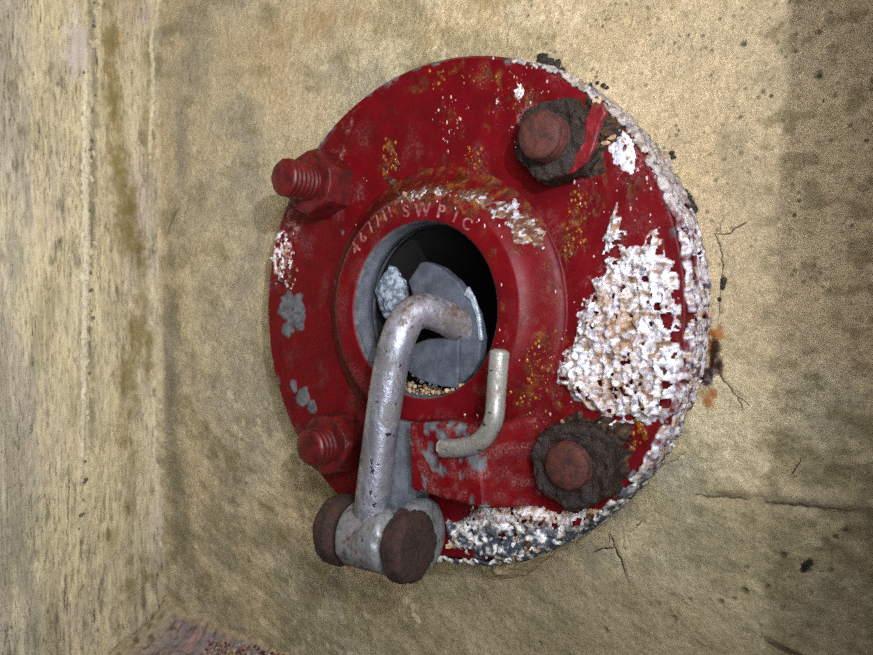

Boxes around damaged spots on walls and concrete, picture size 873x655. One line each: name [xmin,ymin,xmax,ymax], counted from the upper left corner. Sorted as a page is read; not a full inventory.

crack [715,214,747,328]
crack [717,370,750,410]